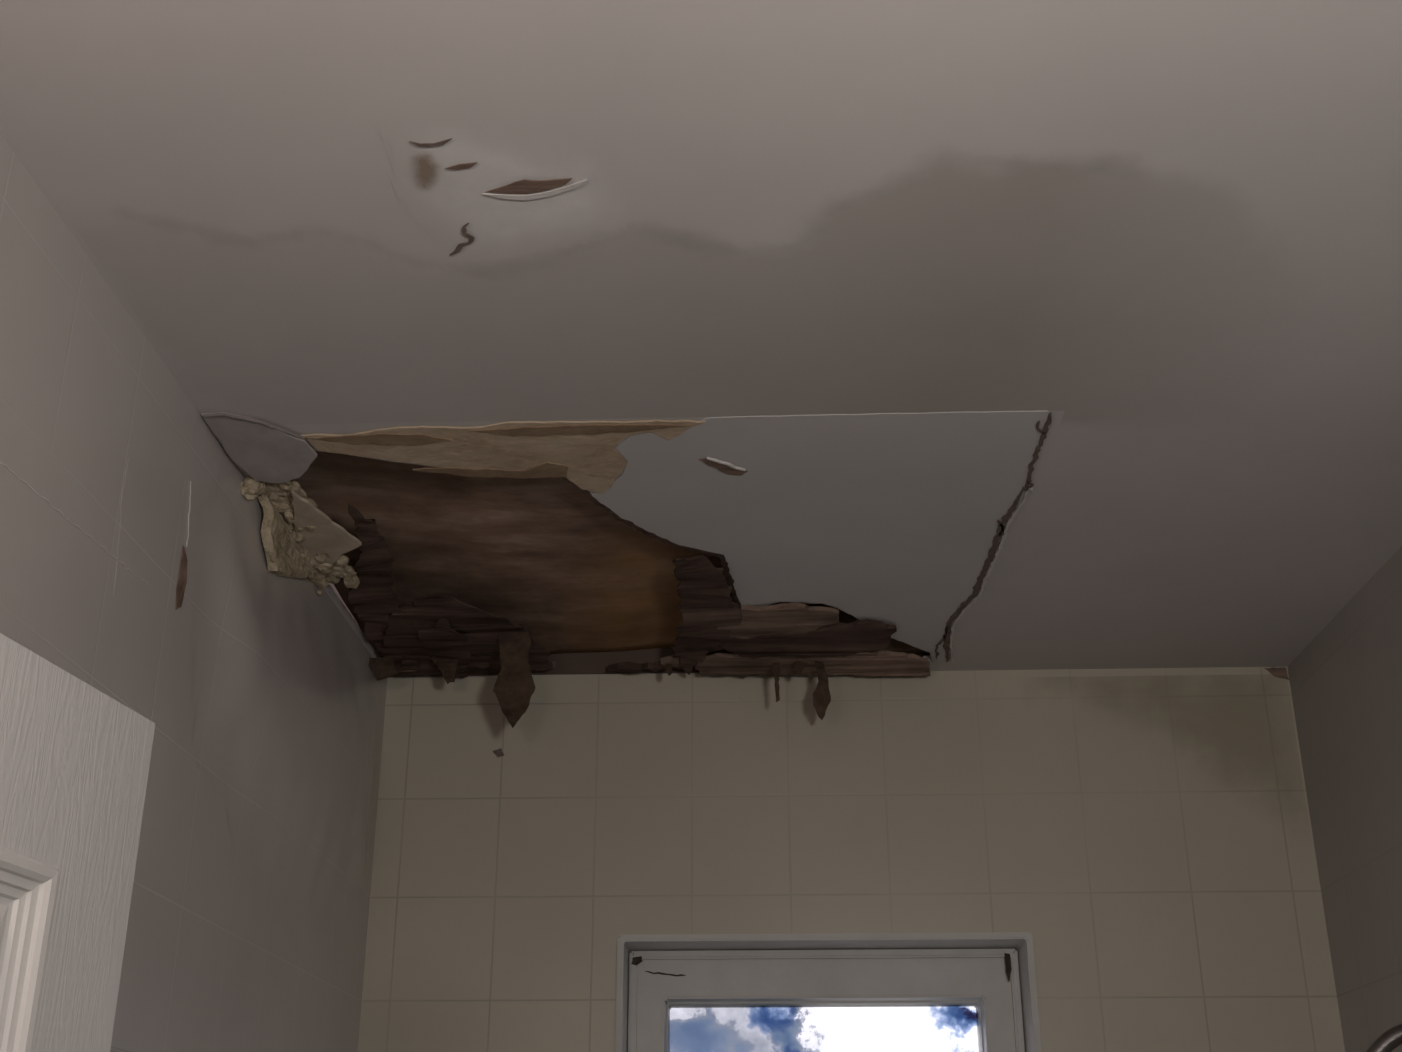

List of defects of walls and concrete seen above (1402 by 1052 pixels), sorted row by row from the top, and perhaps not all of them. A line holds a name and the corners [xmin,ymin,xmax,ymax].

damp [62,141,1340,437]
flaking render [201,412,362,628]
spalling [531,647,735,675]
crack [935,412,1052,662]